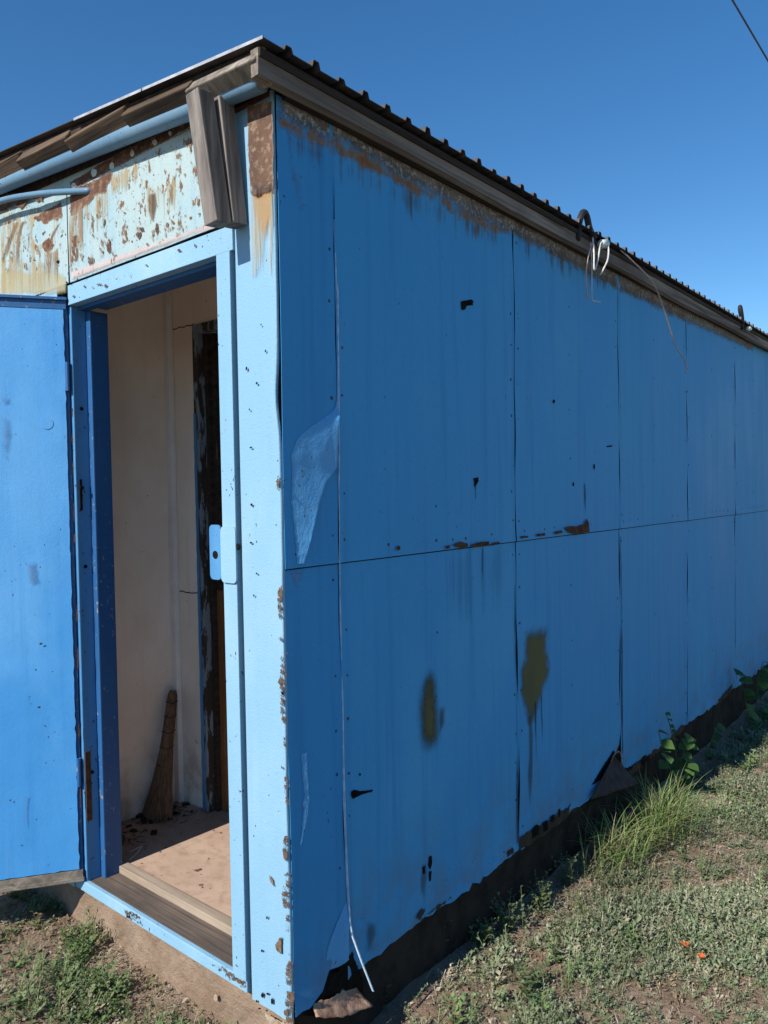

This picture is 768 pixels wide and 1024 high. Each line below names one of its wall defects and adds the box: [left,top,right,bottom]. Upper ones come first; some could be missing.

rust [0,122,200,293]
rust [247,101,503,272]
peeling [278,637,288,723]
damp [423,680,443,743]
damp [522,632,549,729]
peeling [256,837,294,1024]